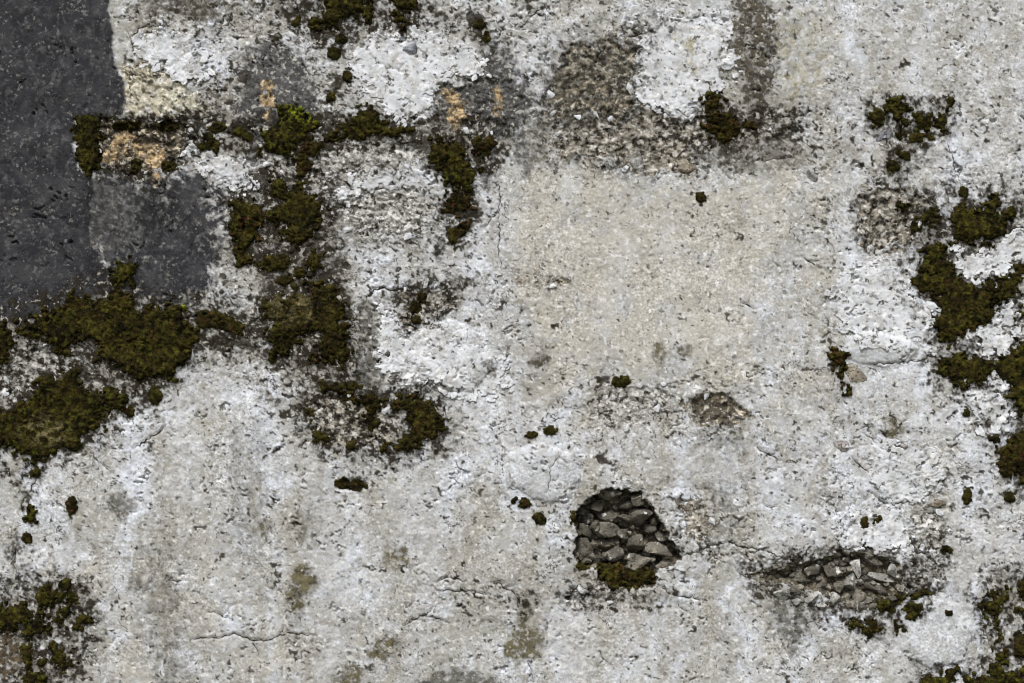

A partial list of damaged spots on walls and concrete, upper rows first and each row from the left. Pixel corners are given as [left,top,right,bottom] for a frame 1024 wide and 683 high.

water stain [233,41,317,164]
water stain [718,0,778,118]
water stain [255,180,337,303]
water stain [431,226,451,258]
water stain [447,270,490,290]
water stain [340,308,384,399]
water stain [527,354,551,377]
water stain [885,419,905,439]
spalling [558,487,720,619]
spalling [745,436,959,611]
crack [194,608,315,651]